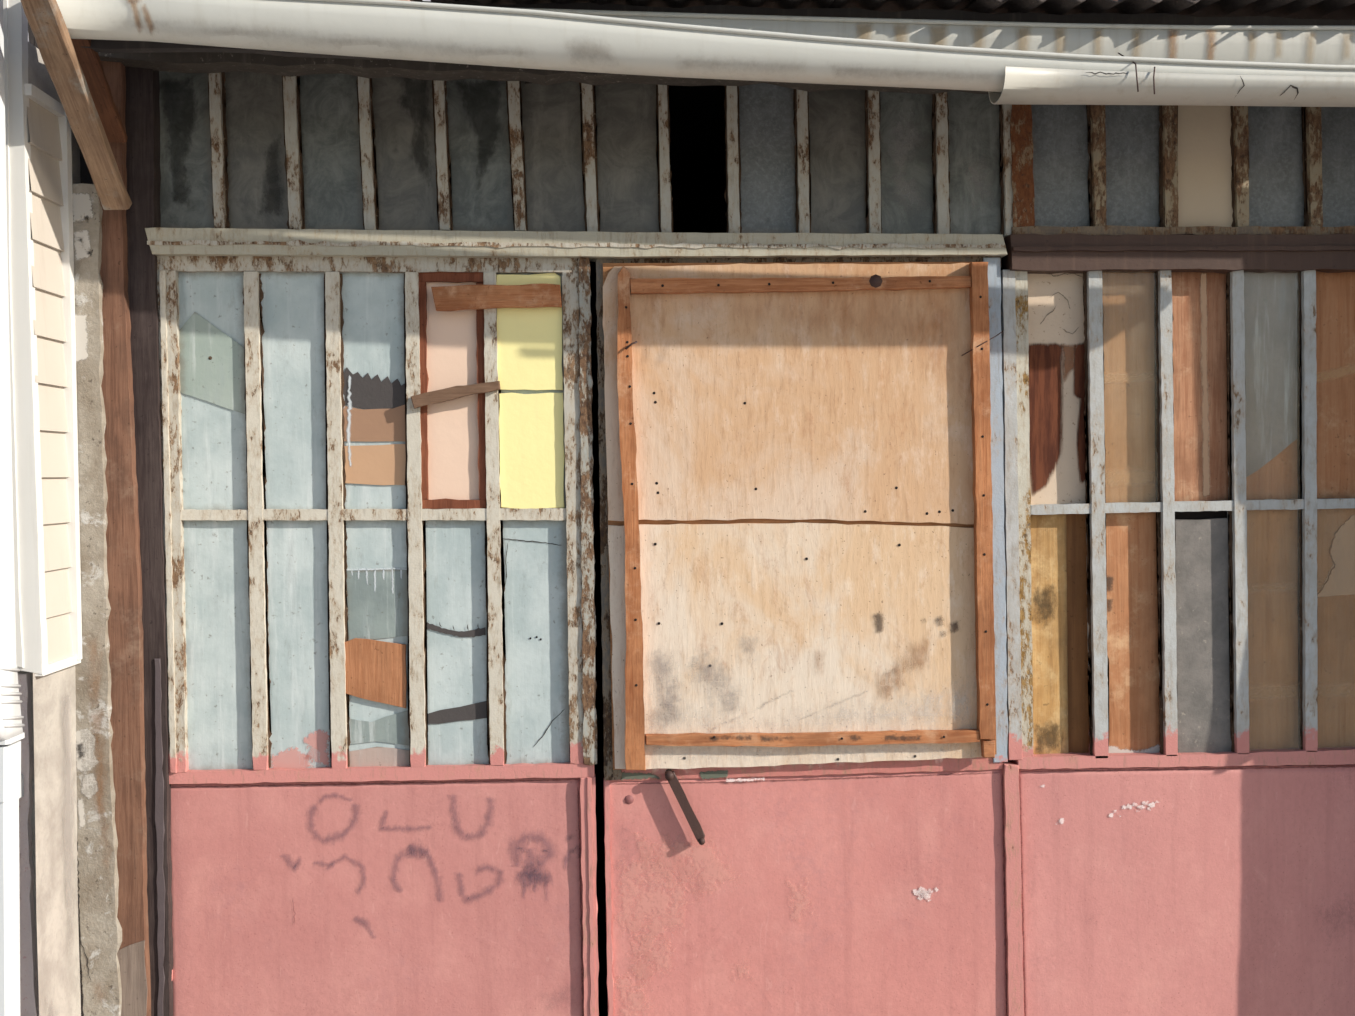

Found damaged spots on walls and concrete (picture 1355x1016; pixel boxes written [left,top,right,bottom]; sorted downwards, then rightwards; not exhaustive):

peeling [1109,801,1159,818]
peeling [913,886,939,901]